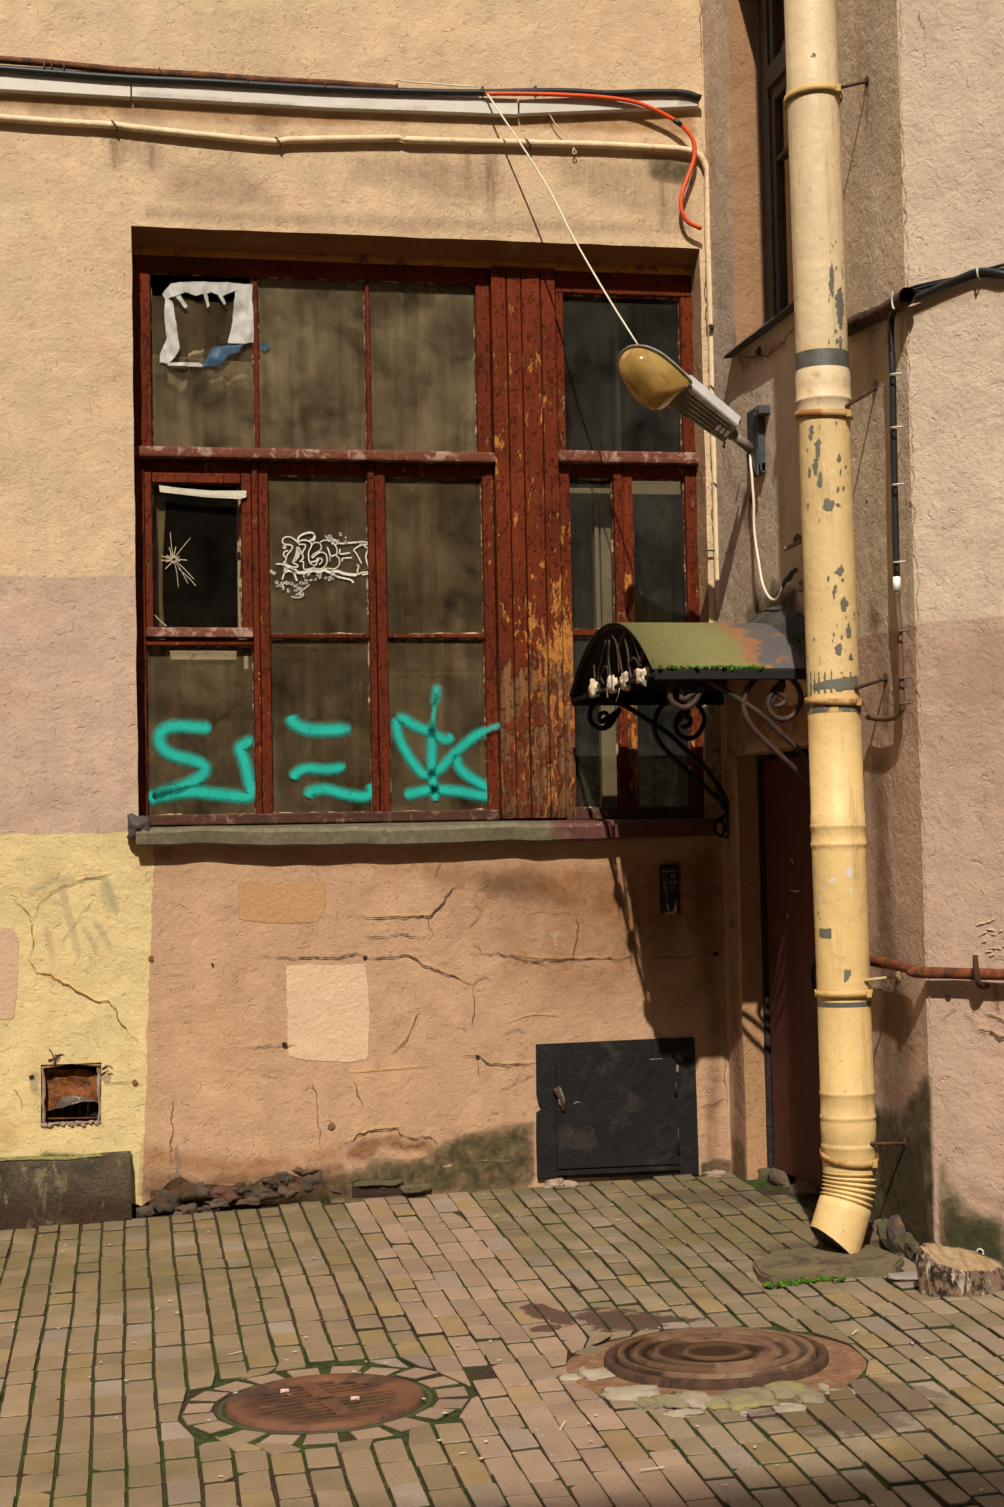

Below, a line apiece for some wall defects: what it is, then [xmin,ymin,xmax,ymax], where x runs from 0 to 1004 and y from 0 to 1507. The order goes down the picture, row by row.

crack [899,0,1004,1122]
crack [13,872,135,1038]
crack [211,858,728,1153]
crack [167,1102,175,1163]
leakage [870,1079,934,1246]